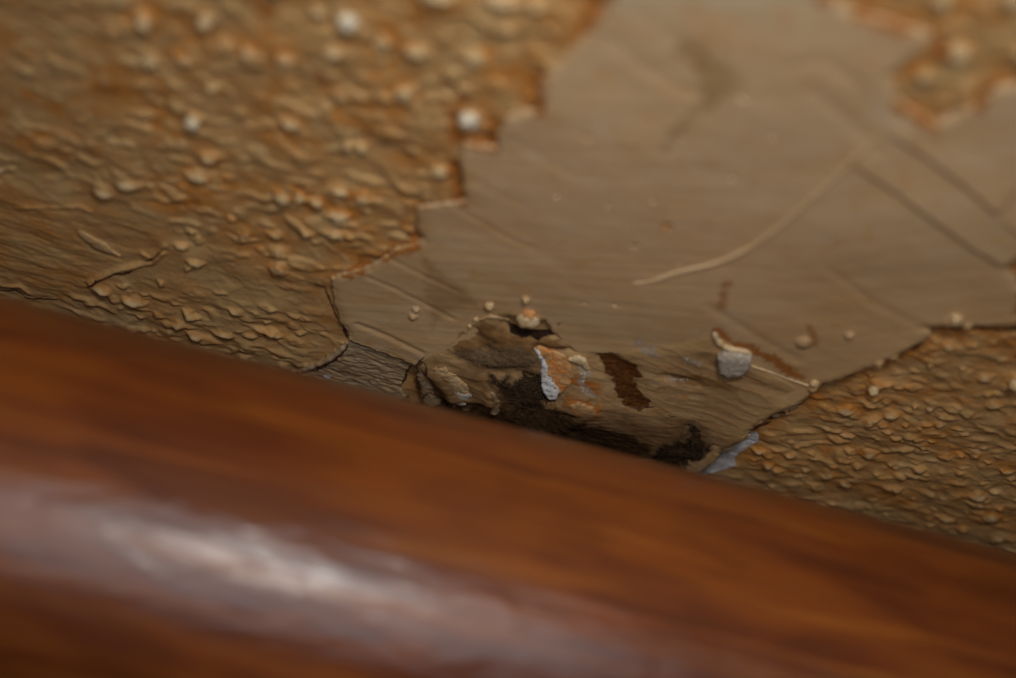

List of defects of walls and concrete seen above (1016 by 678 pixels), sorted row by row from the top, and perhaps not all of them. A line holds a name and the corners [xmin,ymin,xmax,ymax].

peeling [297,0,1016,475]
damp [420,323,724,470]
damp [671,358,738,391]